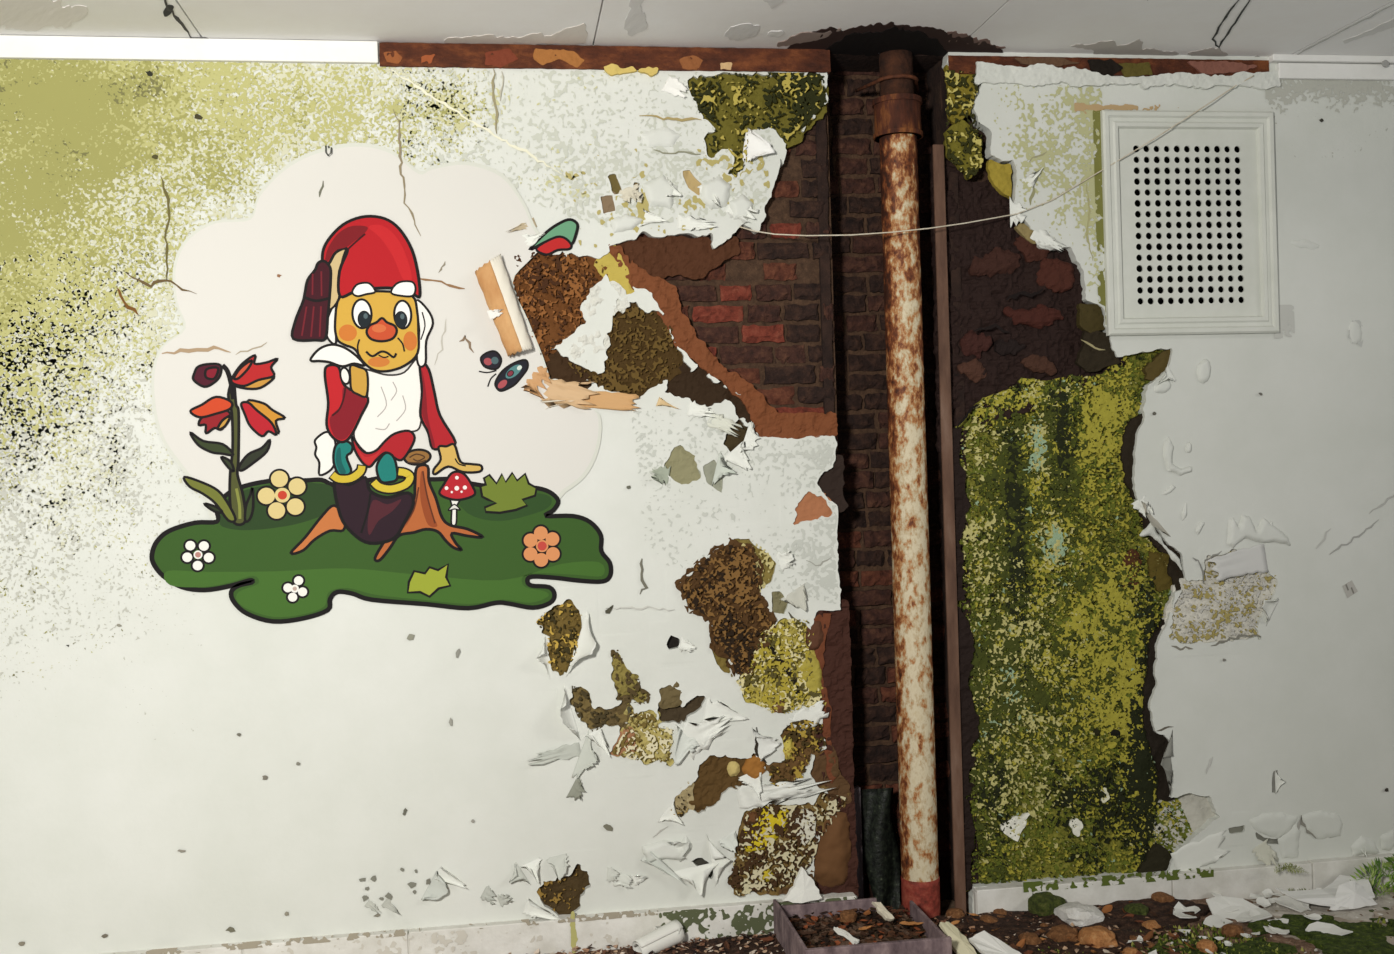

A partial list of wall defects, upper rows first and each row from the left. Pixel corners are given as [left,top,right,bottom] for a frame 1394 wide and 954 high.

mould [53,61,173,114]
rust [384,51,402,64]
rust [485,48,584,69]
rust [679,55,703,71]
flaking render [506,73,837,492]
water stain [0,228,200,701]
spalling [793,434,848,525]
spalling [930,65,1126,891]
spalling [1121,544,1279,643]
spalling [527,537,859,898]
spalling [1153,730,1301,871]
spalling [435,853,590,920]